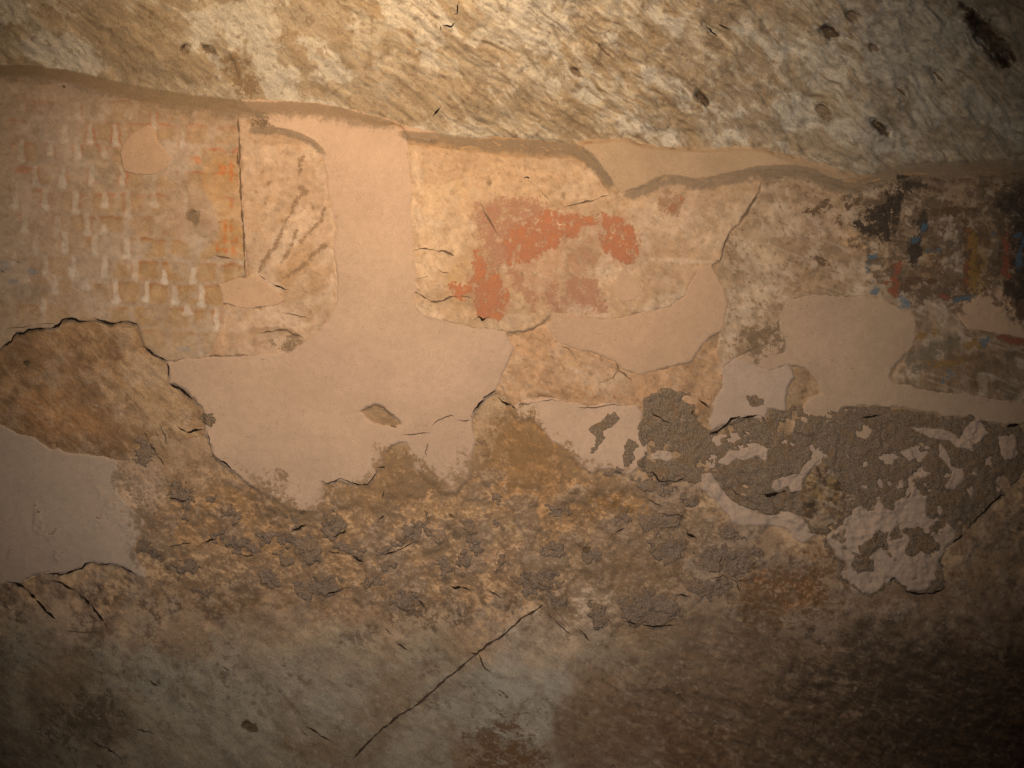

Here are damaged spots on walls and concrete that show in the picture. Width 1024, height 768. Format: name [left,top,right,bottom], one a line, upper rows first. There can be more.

crack [1,317,198,404]
spalling [0,322,216,467]
crack [143,424,241,477]
spalling [493,321,1024,609]
crack [1,561,136,633]
spalling [134,538,218,599]
spalling [166,480,484,611]
spalling [586,588,685,630]
crack [351,579,589,761]